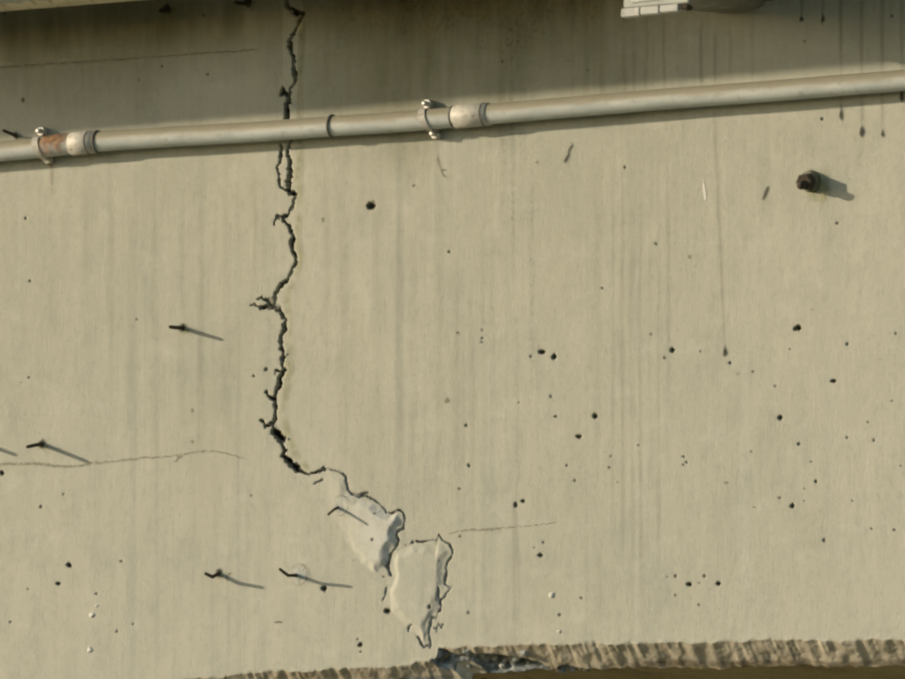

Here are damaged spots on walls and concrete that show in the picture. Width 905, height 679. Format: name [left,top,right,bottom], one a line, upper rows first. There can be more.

crack [251,0,454,649]
spalling [406,647,591,679]